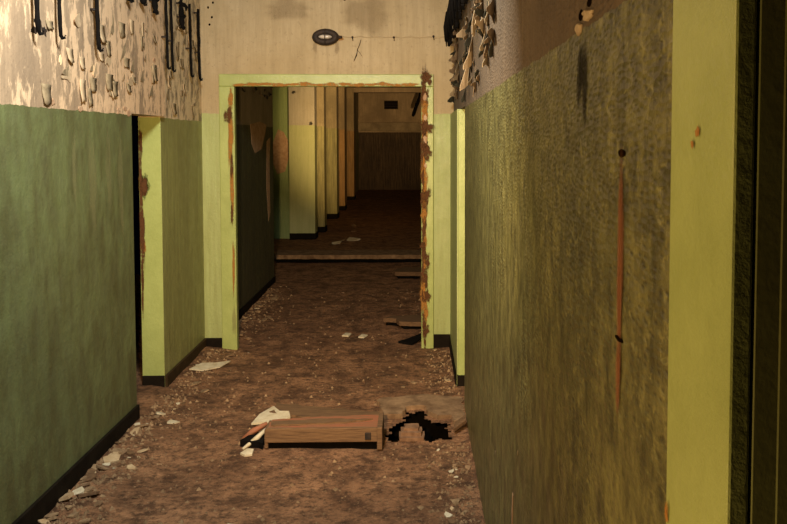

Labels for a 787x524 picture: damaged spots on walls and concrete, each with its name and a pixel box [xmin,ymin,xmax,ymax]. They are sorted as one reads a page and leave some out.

flaking render [31,19,54,36]
peeling [41,83,55,106]
peeling [59,13,198,117]
flaking render [447,0,495,103]
corrosion [139,131,148,312]
corrosion [224,71,434,349]
corrosion [615,177,623,406]